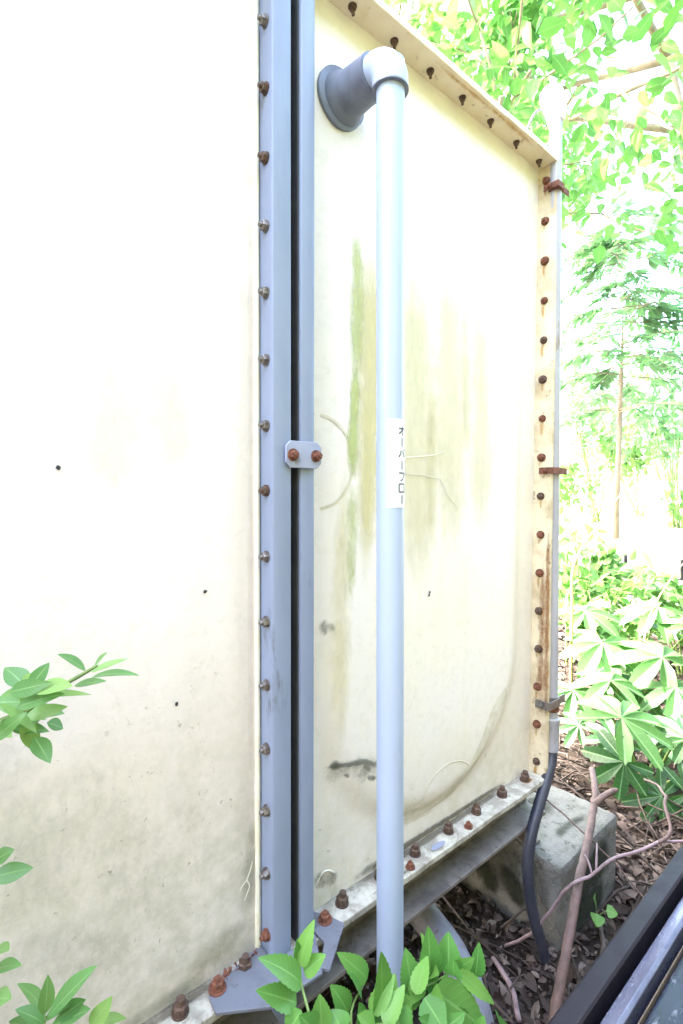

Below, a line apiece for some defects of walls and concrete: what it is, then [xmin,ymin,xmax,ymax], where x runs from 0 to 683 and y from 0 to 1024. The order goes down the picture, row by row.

water stain [349,248,376,530]
corrosion [537,544,550,702]
water stain [331,759,376,780]